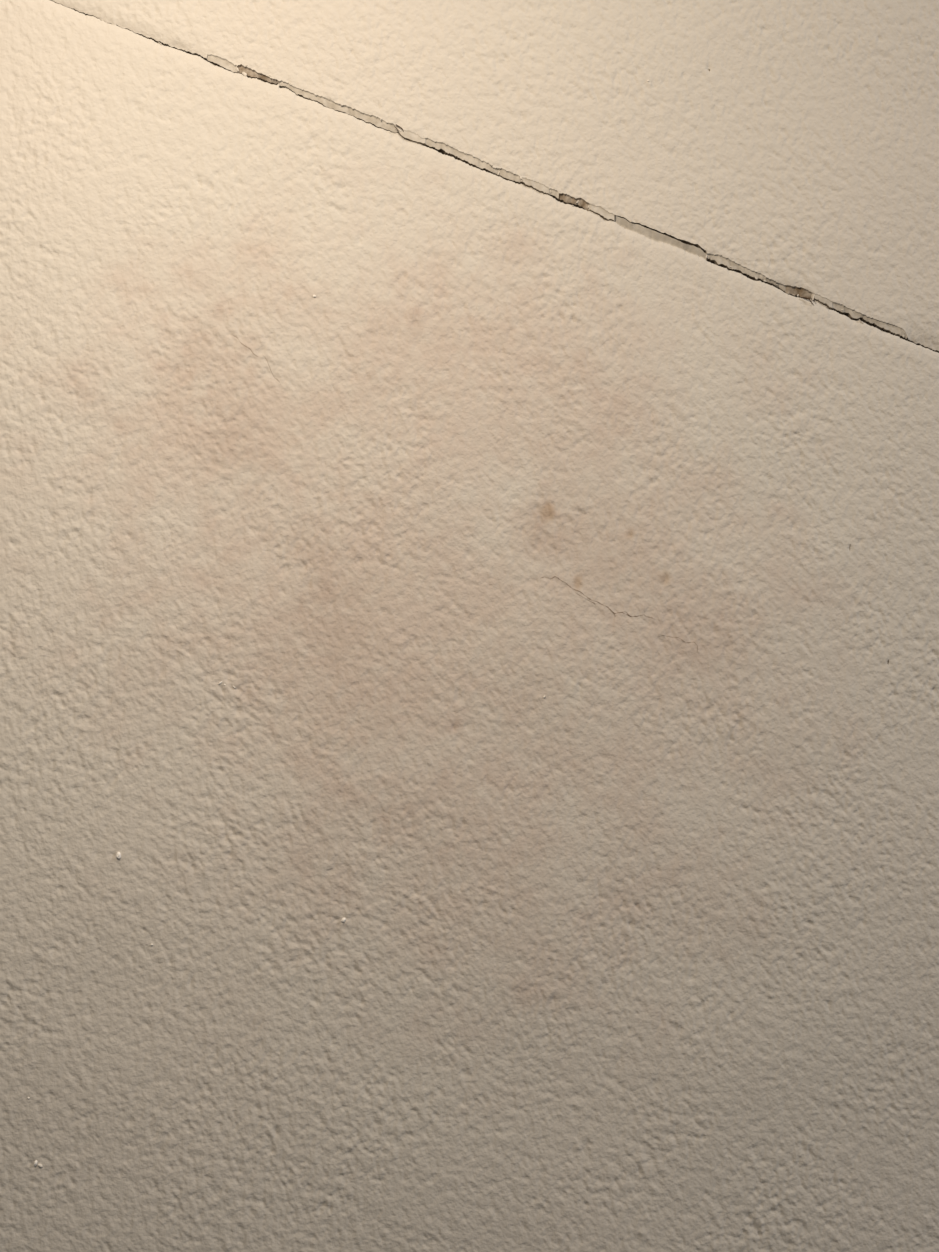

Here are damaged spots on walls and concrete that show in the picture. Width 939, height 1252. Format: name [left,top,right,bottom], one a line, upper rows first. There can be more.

crack [50,0,939,353]